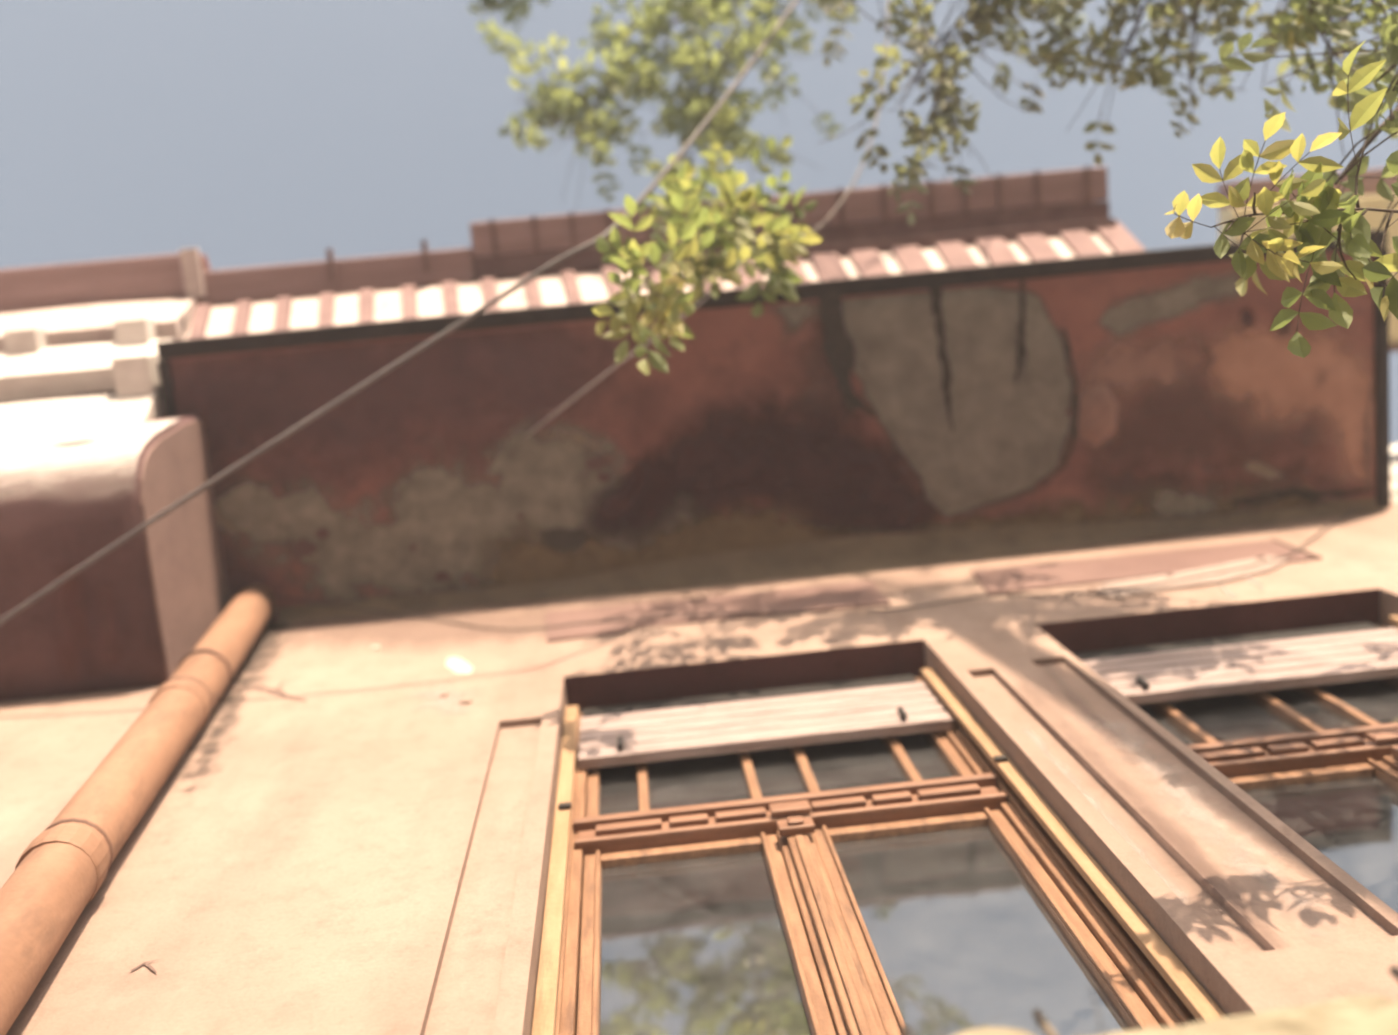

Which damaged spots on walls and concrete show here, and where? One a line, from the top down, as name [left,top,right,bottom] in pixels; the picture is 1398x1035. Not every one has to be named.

spalling [214,426,708,604]
water stain [589,326,933,534]
crack [929,285,953,432]
spalling [841,272,1375,519]